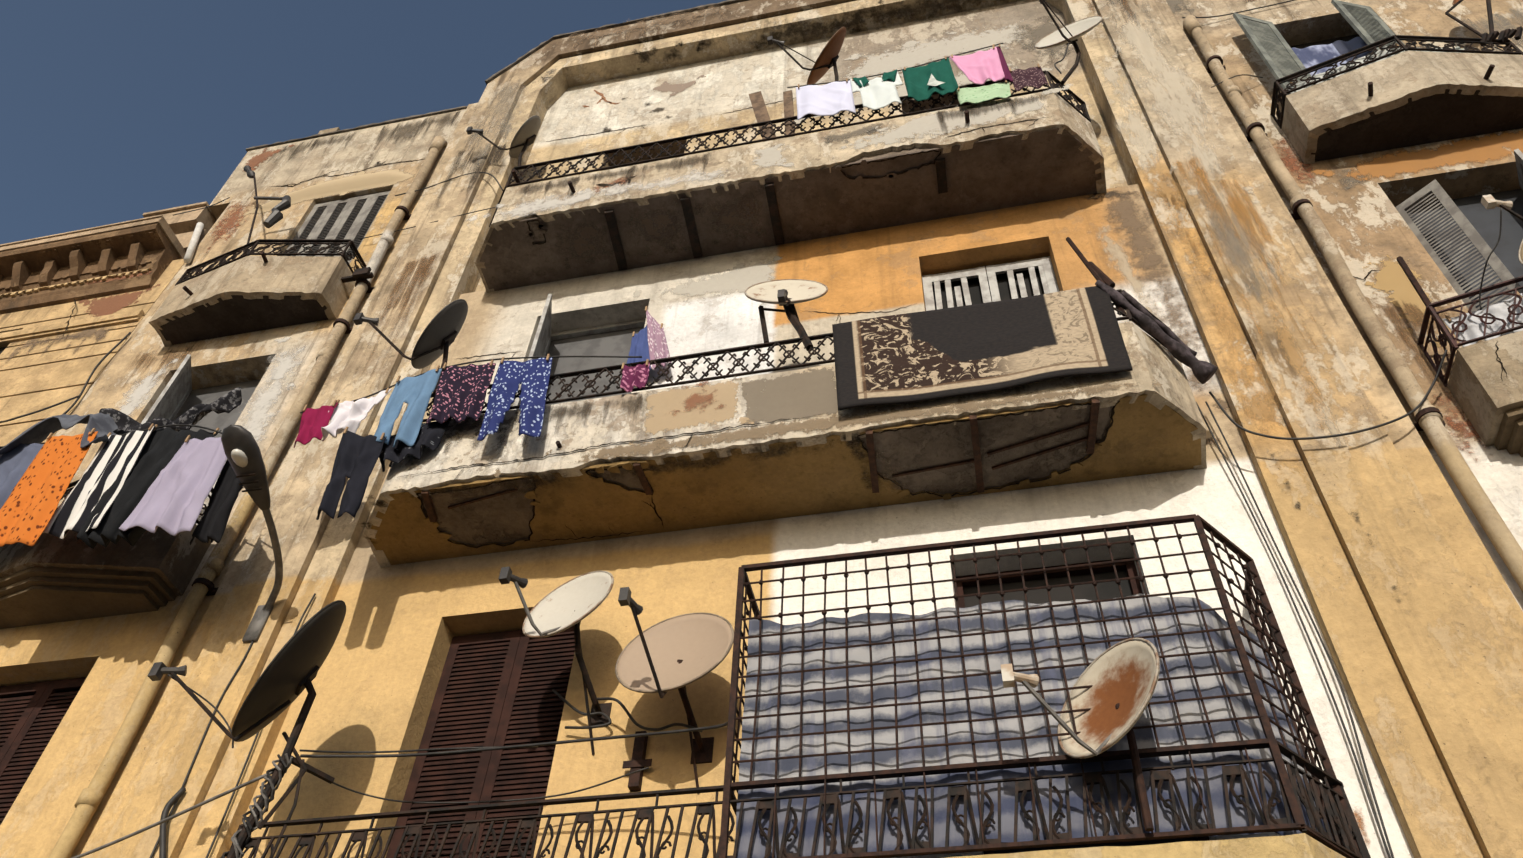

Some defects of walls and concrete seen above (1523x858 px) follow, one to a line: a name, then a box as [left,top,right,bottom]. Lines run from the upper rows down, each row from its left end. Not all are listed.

crack [1495,341,1507,381]
spalling [575,367,1134,500]
spalling [416,468,540,548]